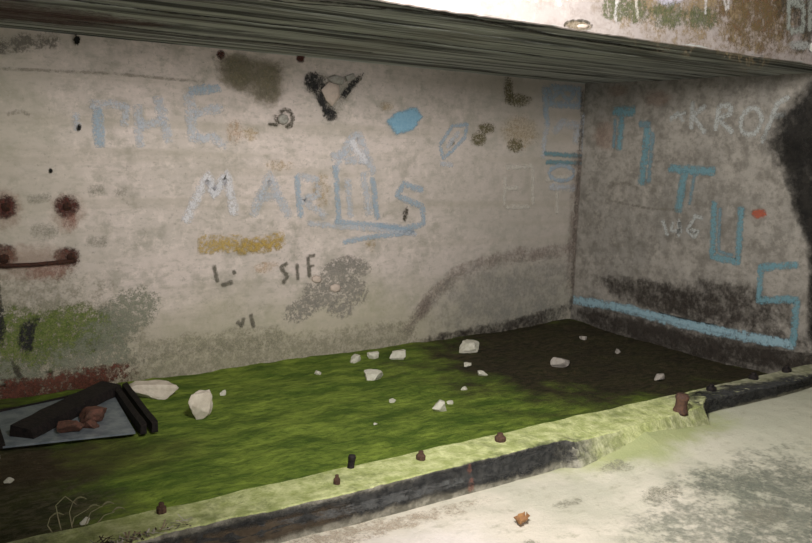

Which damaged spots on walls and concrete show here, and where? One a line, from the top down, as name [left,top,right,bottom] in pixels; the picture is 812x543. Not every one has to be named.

damp [602,0,812,60]
damp [216,50,281,100]
rust [0,195,16,219]
rust [55,195,79,218]
damp [576,82,812,371]
rust [0,244,18,269]
rust [54,247,80,266]
damp [17,319,40,352]
rust [0,363,130,399]